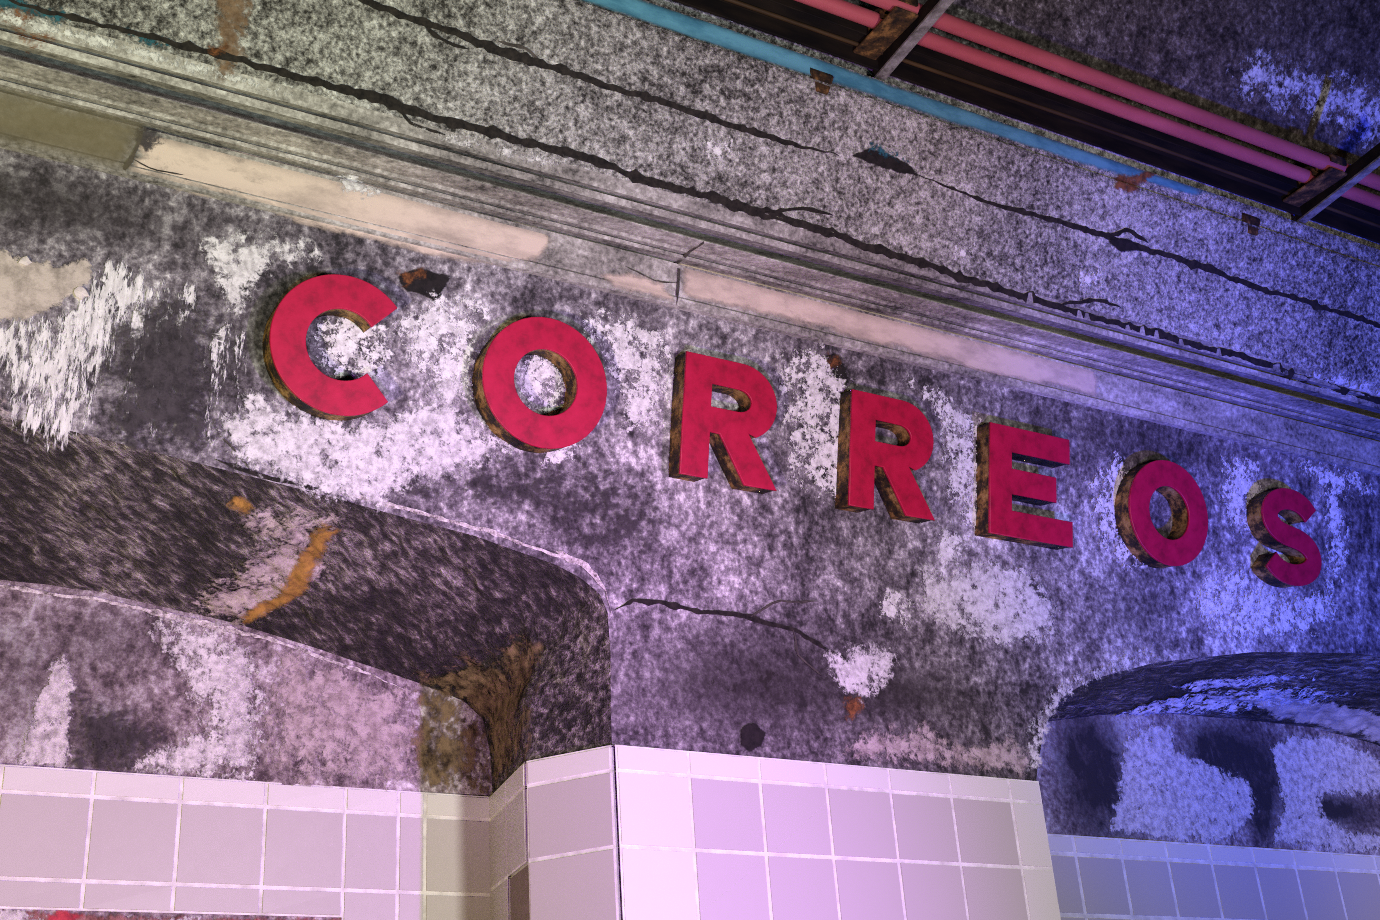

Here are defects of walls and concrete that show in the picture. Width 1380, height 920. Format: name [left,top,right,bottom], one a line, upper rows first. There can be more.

corrosion [209,0,252,76]
crack [9,0,1380,405]
flaking render [0,250,92,321]
leakage [0,260,245,451]
corrosion [228,497,253,513]
crack [216,435,355,505]
corrosion [242,525,338,623]
crack [615,599,847,676]
corrosion [411,635,543,794]